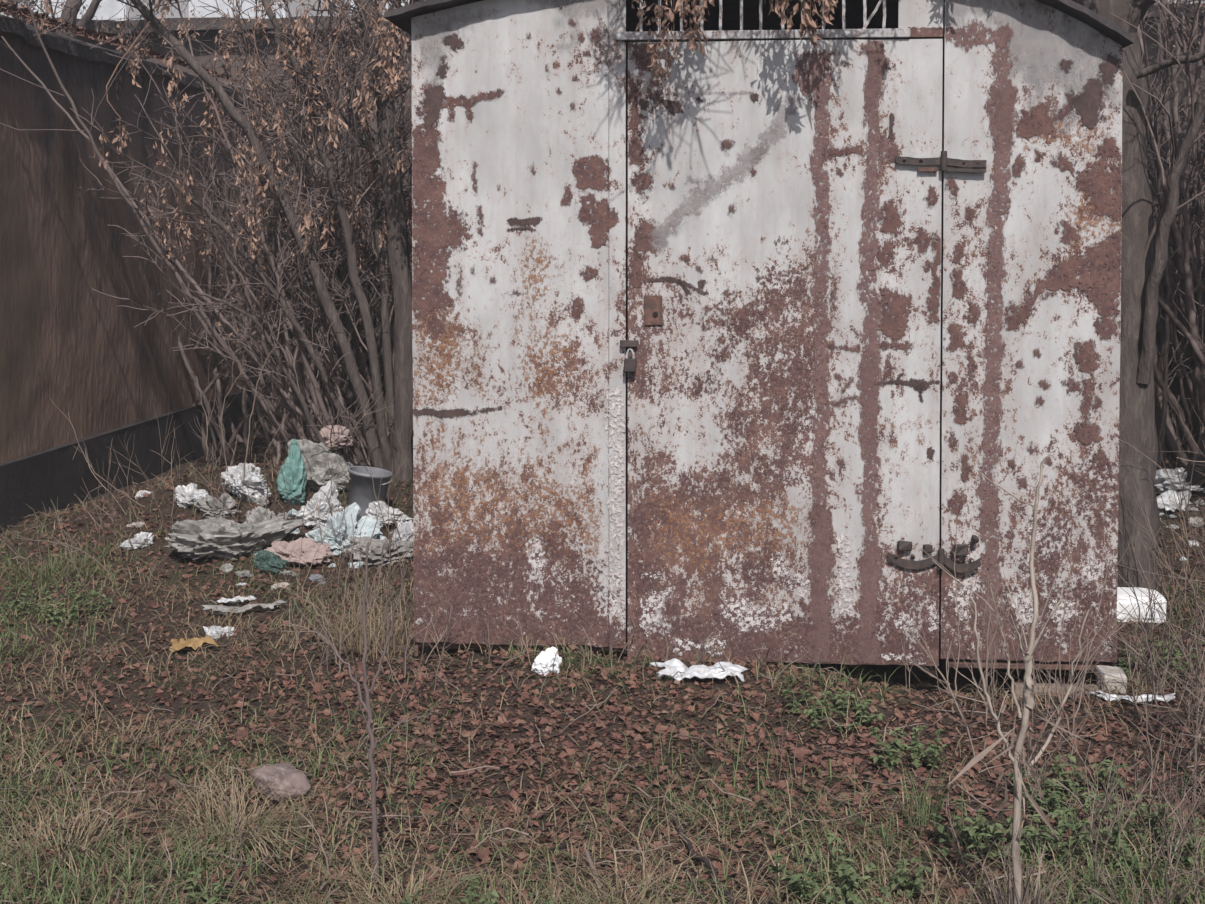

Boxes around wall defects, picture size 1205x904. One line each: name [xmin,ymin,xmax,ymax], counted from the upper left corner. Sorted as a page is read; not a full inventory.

rust [413,19,1121,664]